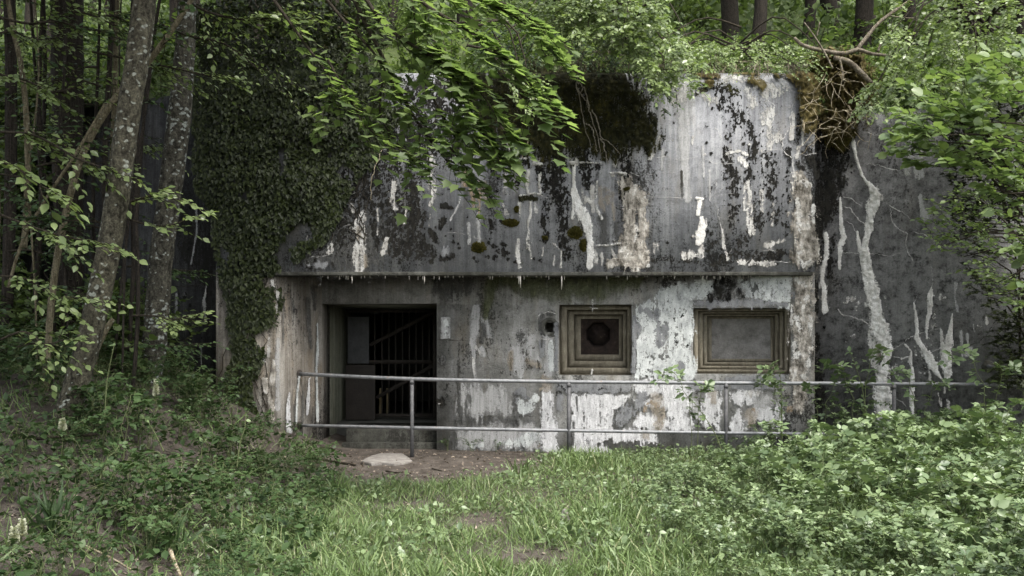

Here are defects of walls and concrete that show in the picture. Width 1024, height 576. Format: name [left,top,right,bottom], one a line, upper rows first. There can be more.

damp [263,75,647,434]
peeling [498,170,822,451]
damp [647,75,989,431]